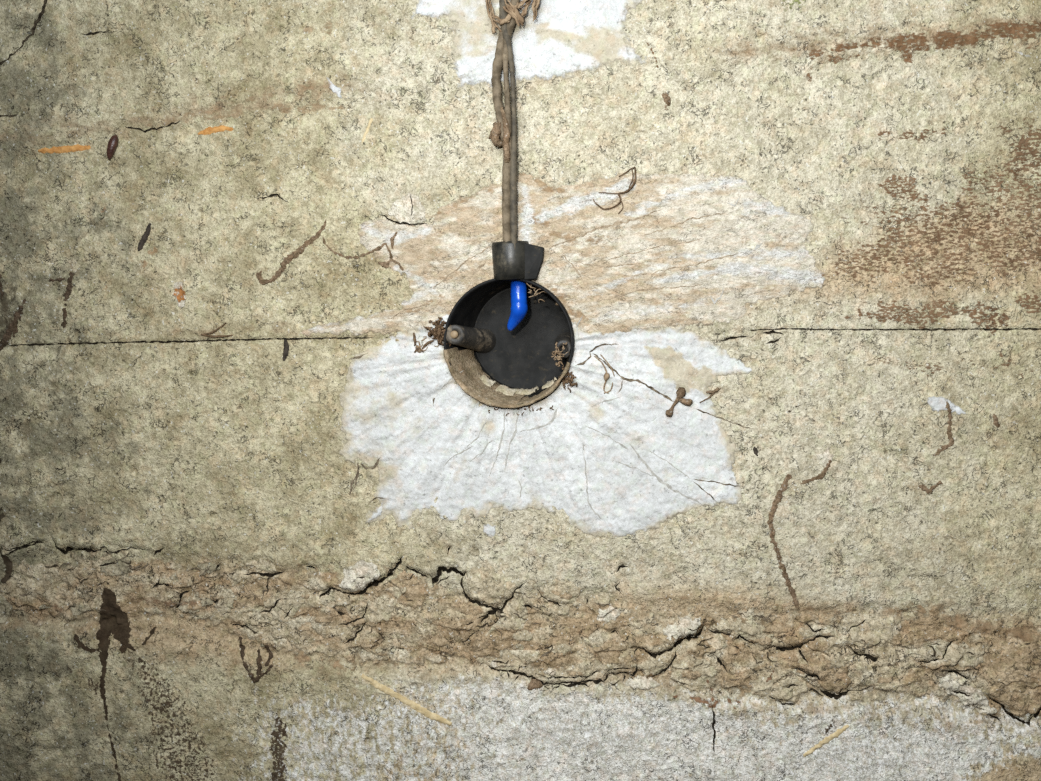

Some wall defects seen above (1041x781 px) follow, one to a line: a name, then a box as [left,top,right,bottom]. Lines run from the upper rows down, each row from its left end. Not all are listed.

crack [0,0,47,65]
crack [10,337,374,346]
crack [721,328,1041,344]
leakage [0,549,13,583]
crack [1,539,189,609]
crack [230,546,588,644]
leakage [74,582,215,781]
crack [486,619,878,705]
crack [919,640,1041,726]
crack [709,703,717,750]